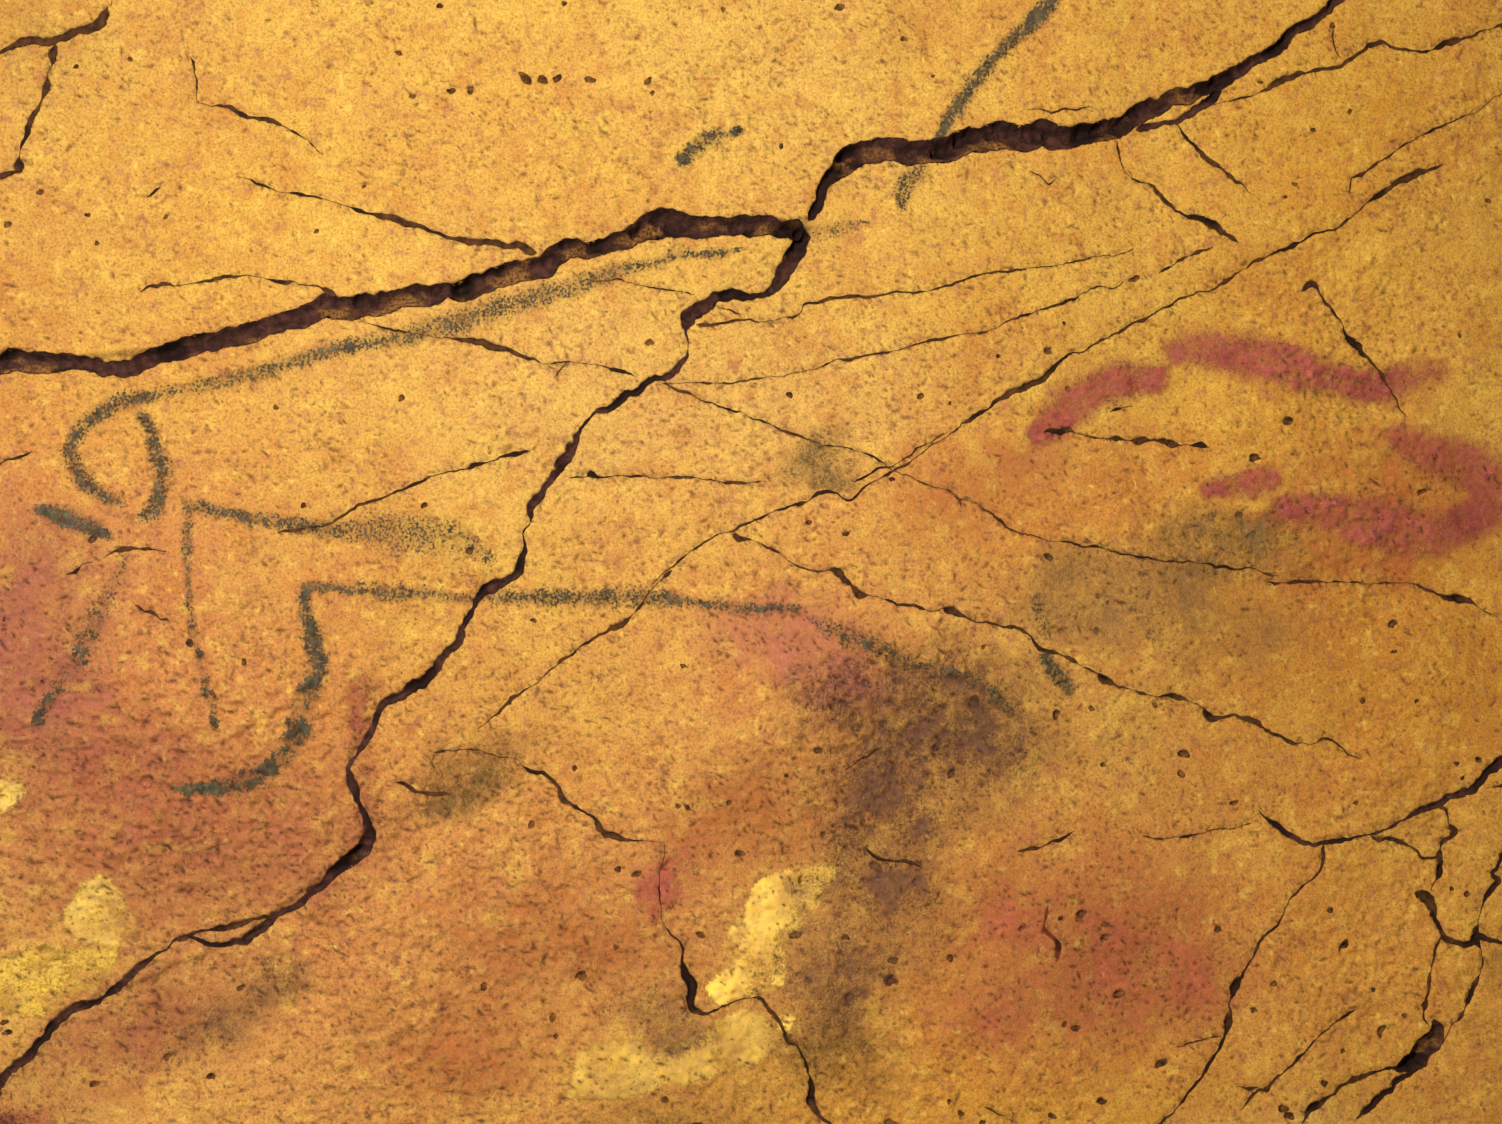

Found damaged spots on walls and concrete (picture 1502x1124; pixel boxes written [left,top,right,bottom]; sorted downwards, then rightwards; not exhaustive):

crack [0,0,1502,378]
crack [0,164,1443,1096]
crack [1144,756,1502,1124]